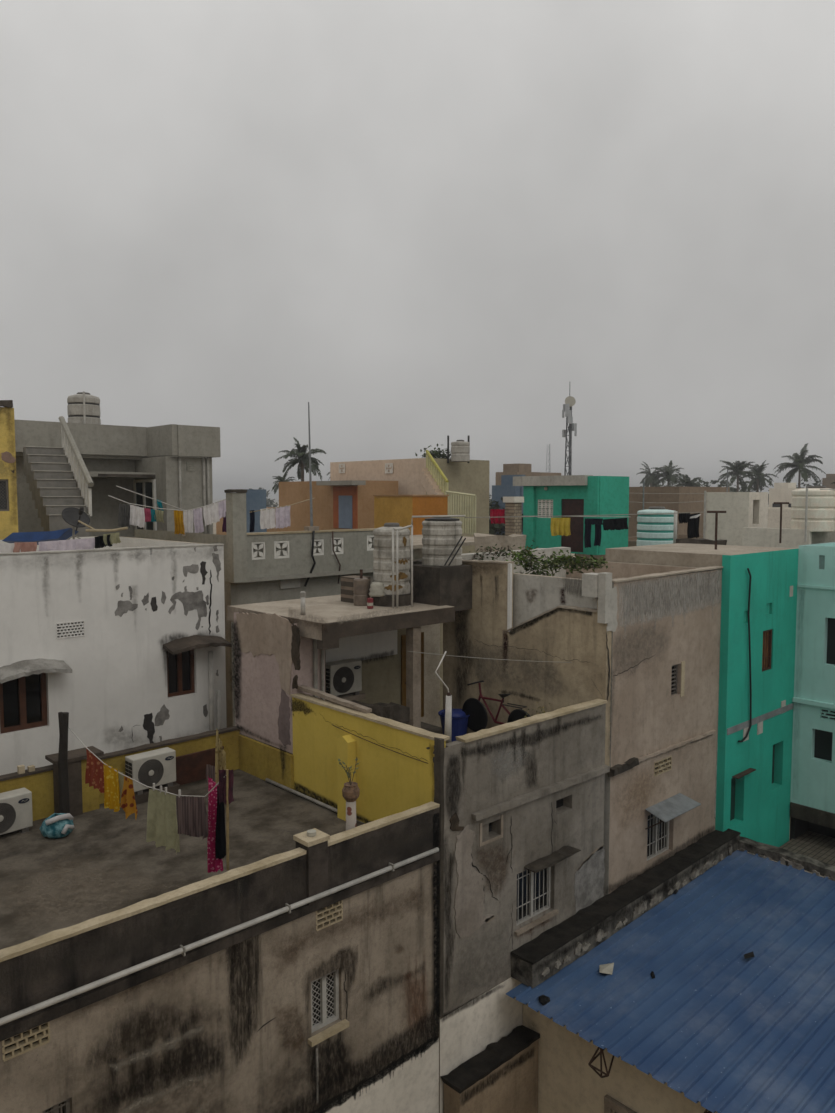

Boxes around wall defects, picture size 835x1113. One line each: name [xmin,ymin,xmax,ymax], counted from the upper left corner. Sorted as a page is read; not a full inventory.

peeling [115,546,221,633]
peeling [143,705,170,743]
water stain [282,717,598,1113]
water stain [95,938,257,1113]